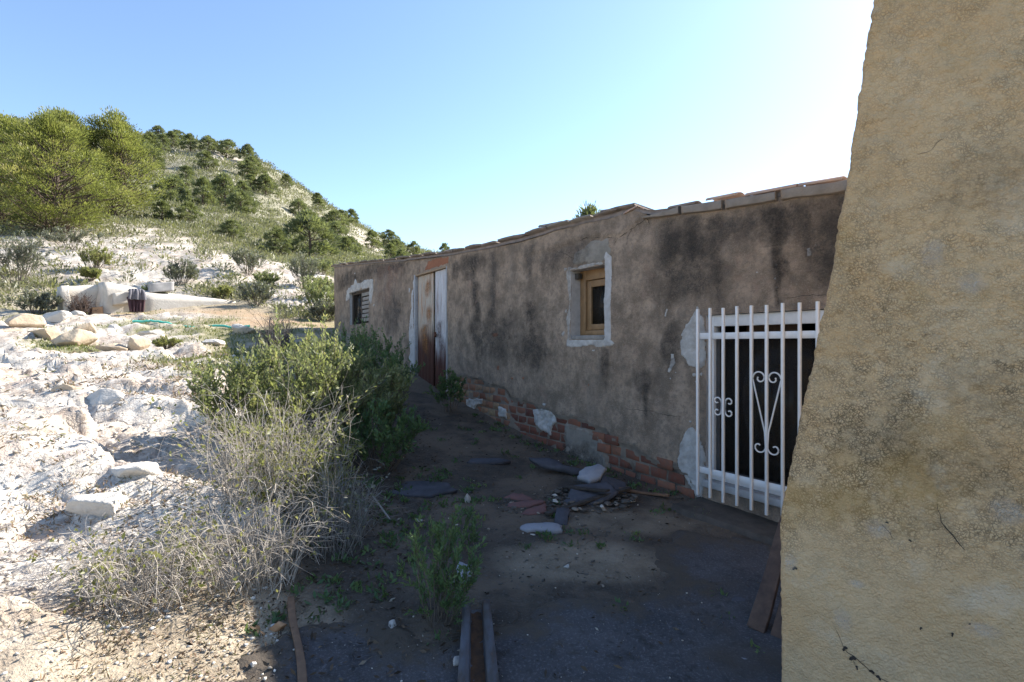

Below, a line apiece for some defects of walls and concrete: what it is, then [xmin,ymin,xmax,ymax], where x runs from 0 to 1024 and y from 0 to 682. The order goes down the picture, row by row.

flaking render [668,307,707,382]
flaking render [448,373,706,499]
crack [933,504,965,550]